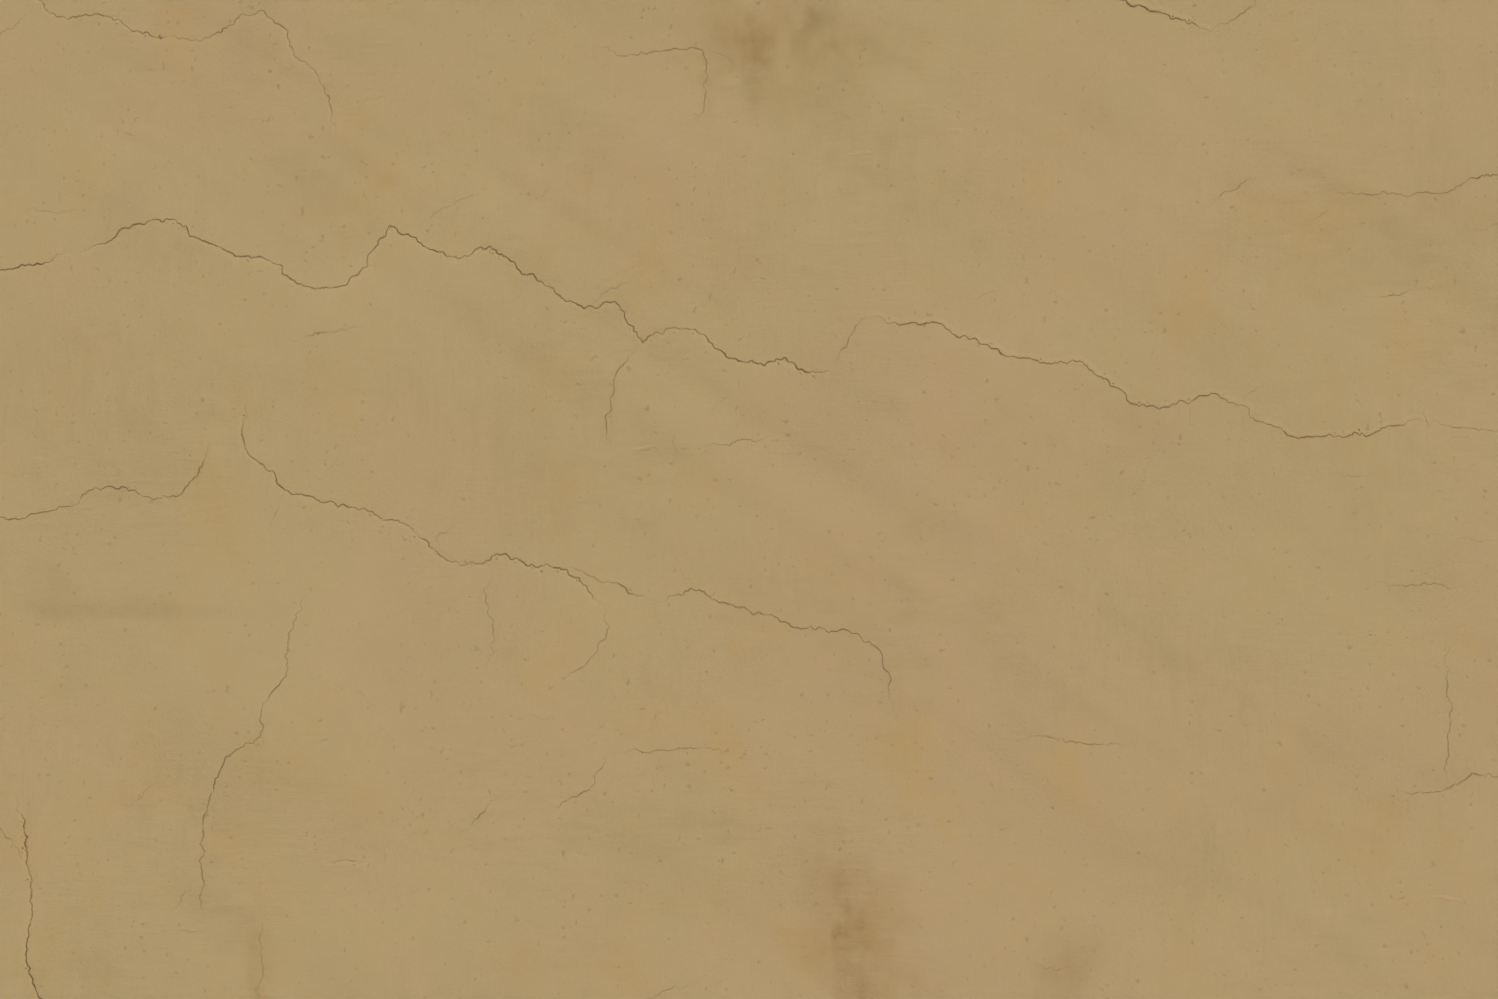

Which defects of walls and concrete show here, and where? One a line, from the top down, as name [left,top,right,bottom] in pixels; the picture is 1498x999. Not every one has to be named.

crack [1126,0,1213,32]
crack [0,251,70,277]
crack [873,311,1426,439]
crack [11,796,42,999]